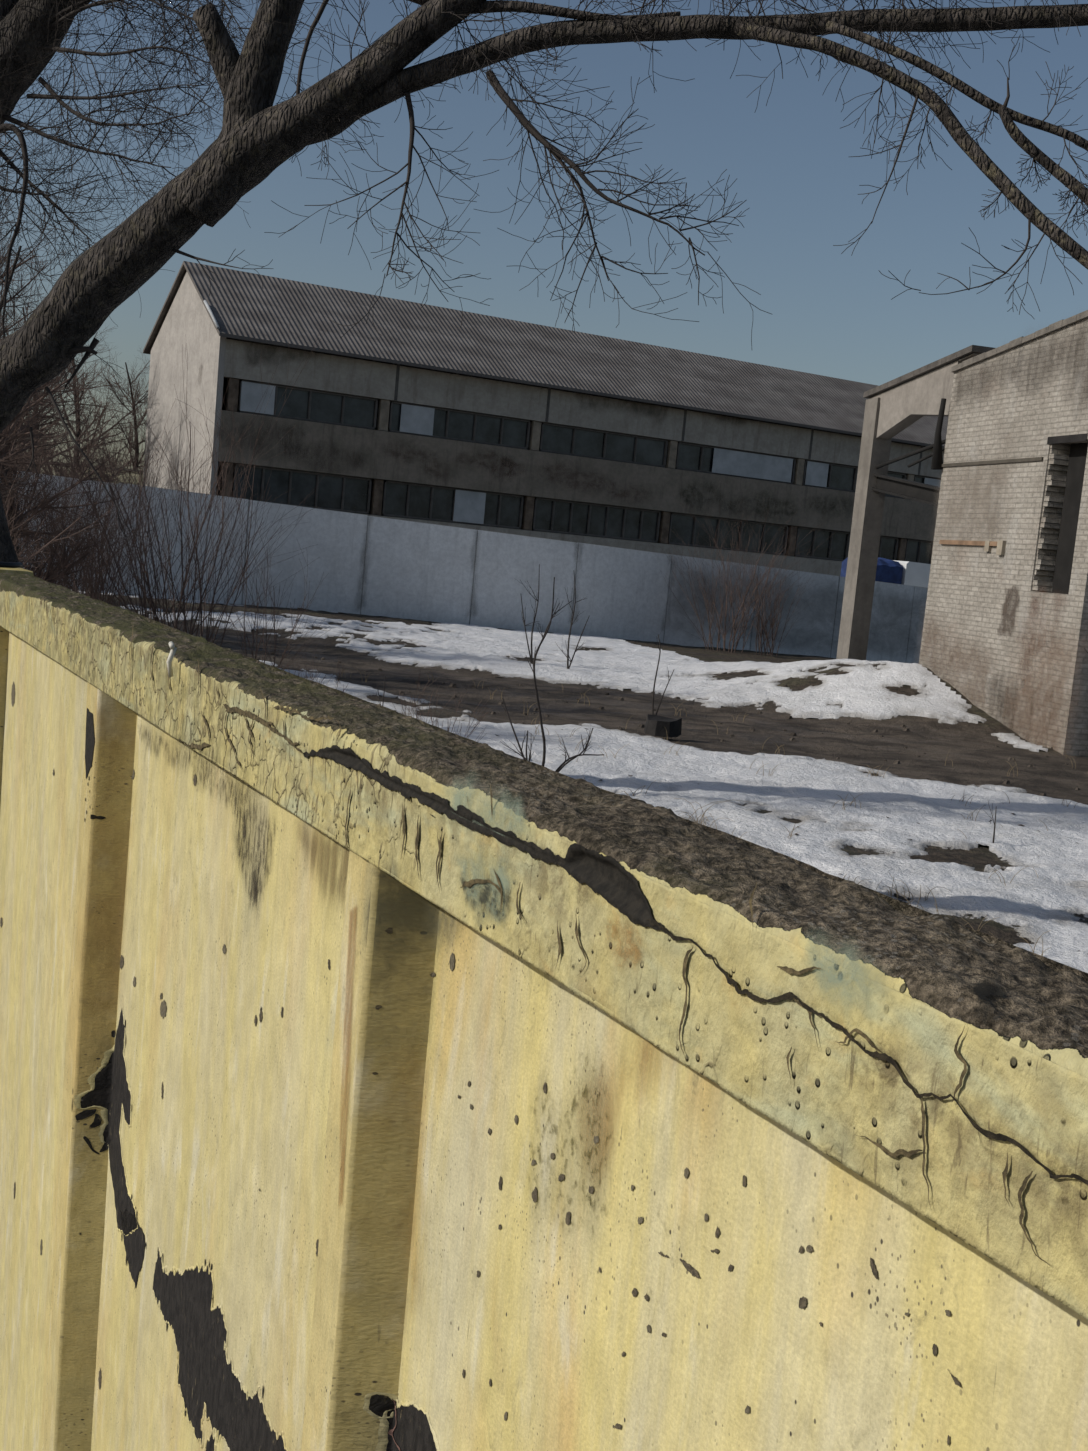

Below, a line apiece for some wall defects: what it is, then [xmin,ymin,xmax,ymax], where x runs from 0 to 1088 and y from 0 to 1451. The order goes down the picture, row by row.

spalling [84,708,106,822]
crack [118,630,341,770]
crack [344,791,352,848]
crack [400,769,587,976]
crack [646,919,1088,1266]
peeling [72,1006,288,1451]
peeling [363,1392,440,1451]